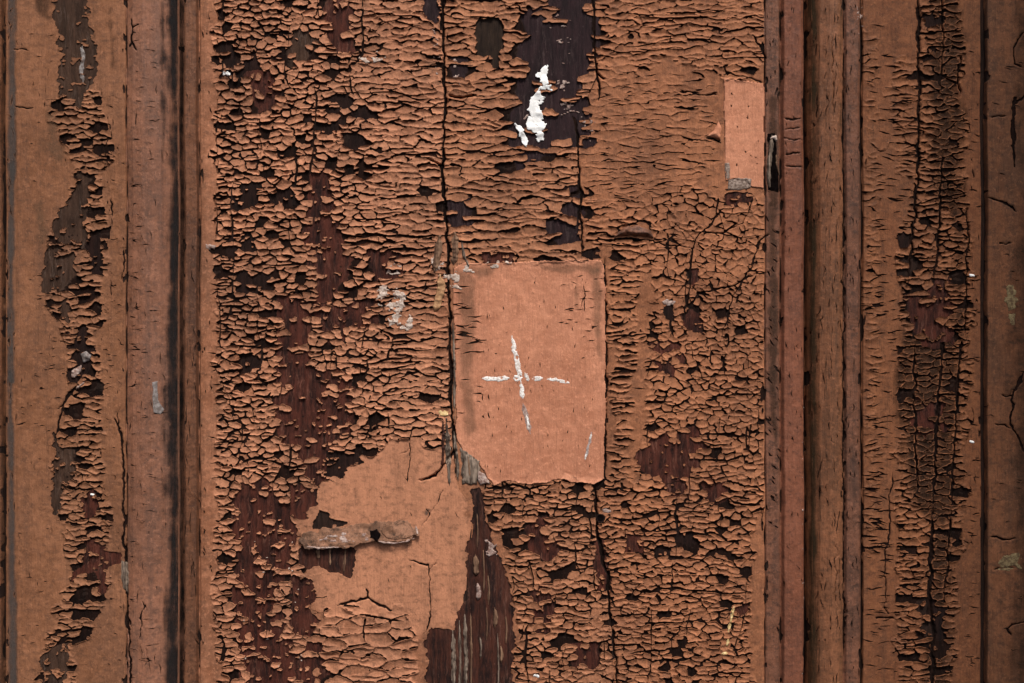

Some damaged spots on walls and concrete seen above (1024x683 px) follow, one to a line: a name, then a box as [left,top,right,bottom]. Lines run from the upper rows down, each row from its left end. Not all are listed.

peeling [52,0,99,109]
peeling [285,0,356,70]
peeling [474,17,504,69]
peeling [507,0,609,172]
peeling [41,168,104,392]
peeling [272,168,406,486]
peeling [444,195,474,243]
crack [204,0,770,683]
peeling [541,182,586,245]
peeling [634,426,728,506]
peeling [230,476,420,683]
peeling [423,487,517,683]